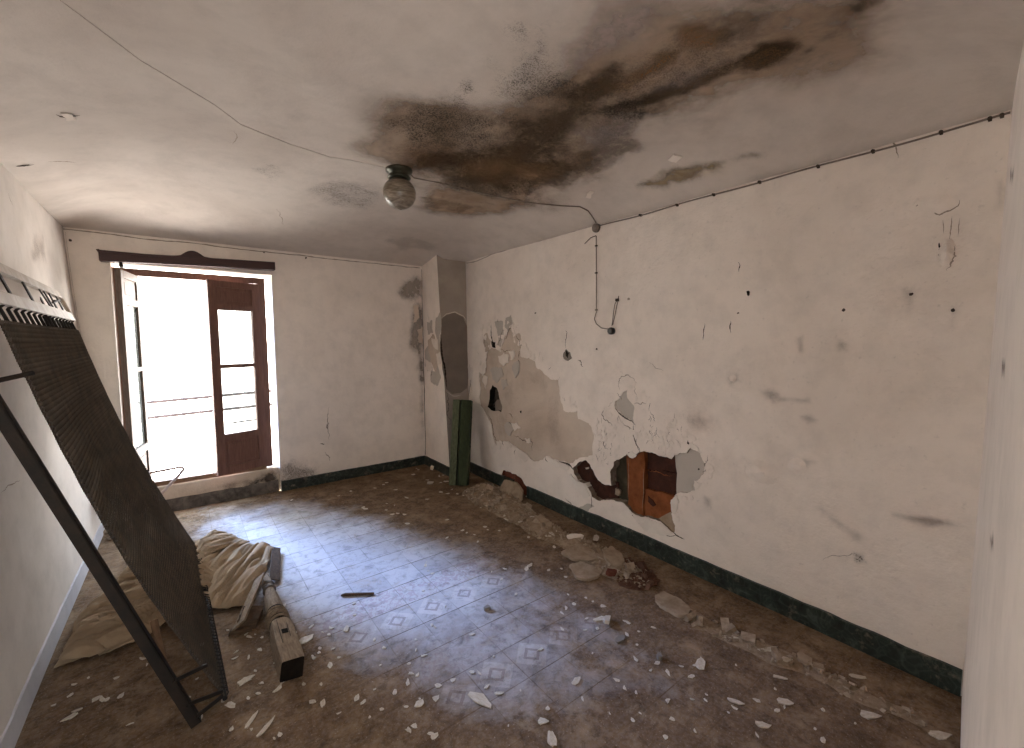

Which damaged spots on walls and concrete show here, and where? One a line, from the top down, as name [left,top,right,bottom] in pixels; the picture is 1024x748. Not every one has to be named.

crack [58,113,80,121]
leakage [360,0,878,215]
peeling [425,313,442,386]
peeling [479,315,706,539]